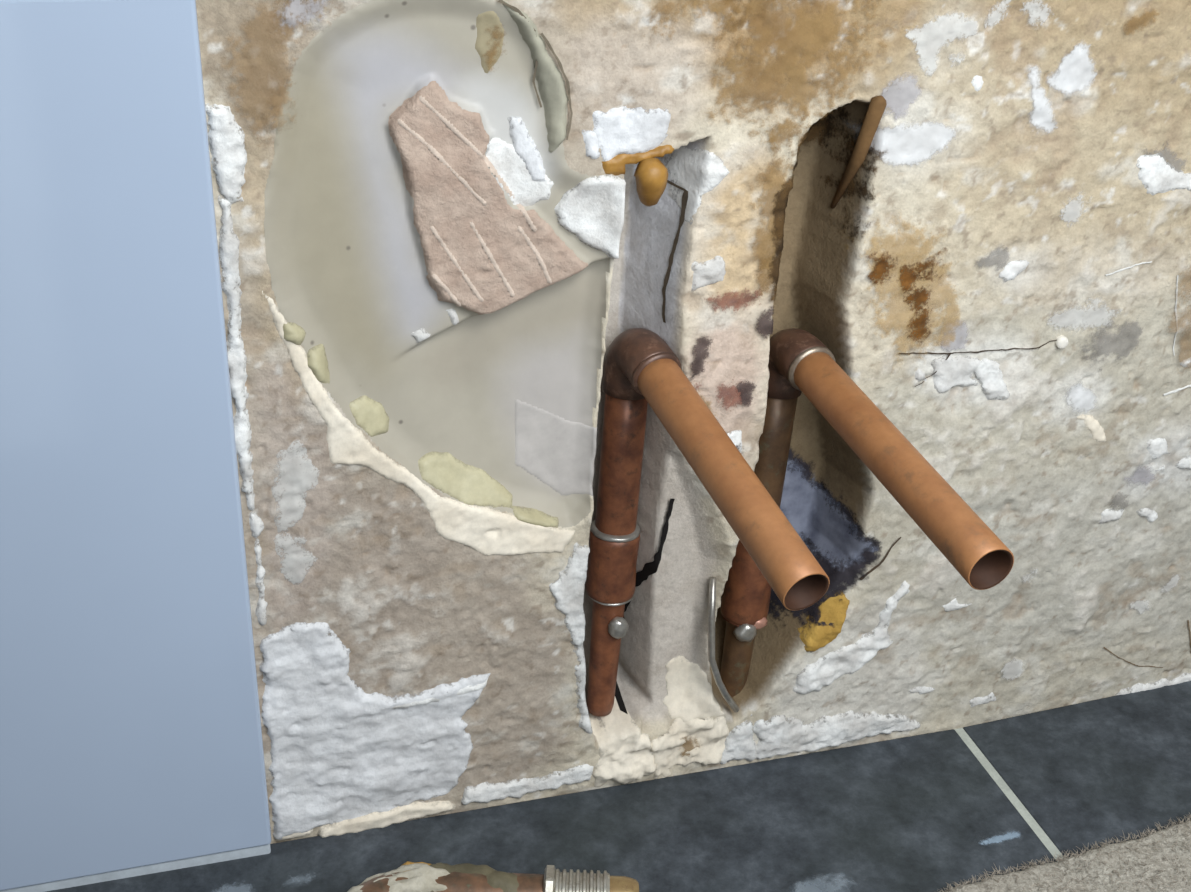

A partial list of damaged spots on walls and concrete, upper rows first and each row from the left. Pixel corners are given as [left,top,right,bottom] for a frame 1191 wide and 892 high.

spalling [1136,153,1191,195]
corrosion [868,248,946,343]
spalling [262,0,626,733]
peeling [275,801,456,841]